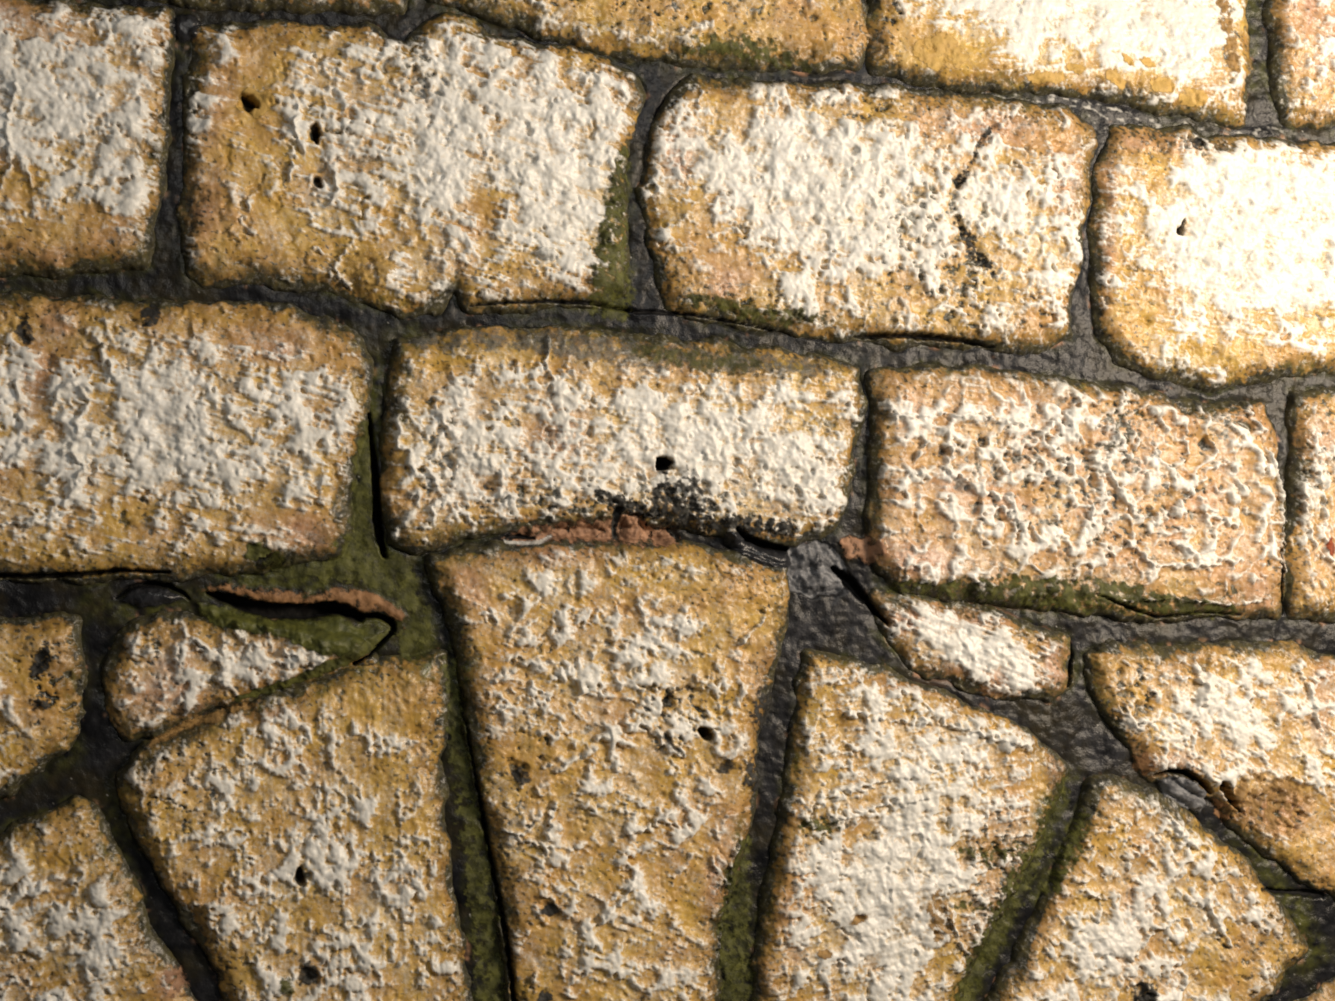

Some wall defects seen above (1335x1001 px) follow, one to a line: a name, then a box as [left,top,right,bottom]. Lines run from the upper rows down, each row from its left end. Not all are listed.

crack [469,299,589,307]
crack [628,310,768,331]
crack [854,333,989,348]
spalling [504,506,676,549]
damp [244,542,272,561]
crack [0,568,405,664]
damp [235,627,395,702]
crack [1154,769,1237,803]
damp [798,818,841,836]
damp [955,839,1025,869]
damp [1039,809,1091,902]
damp [954,900,994,913]